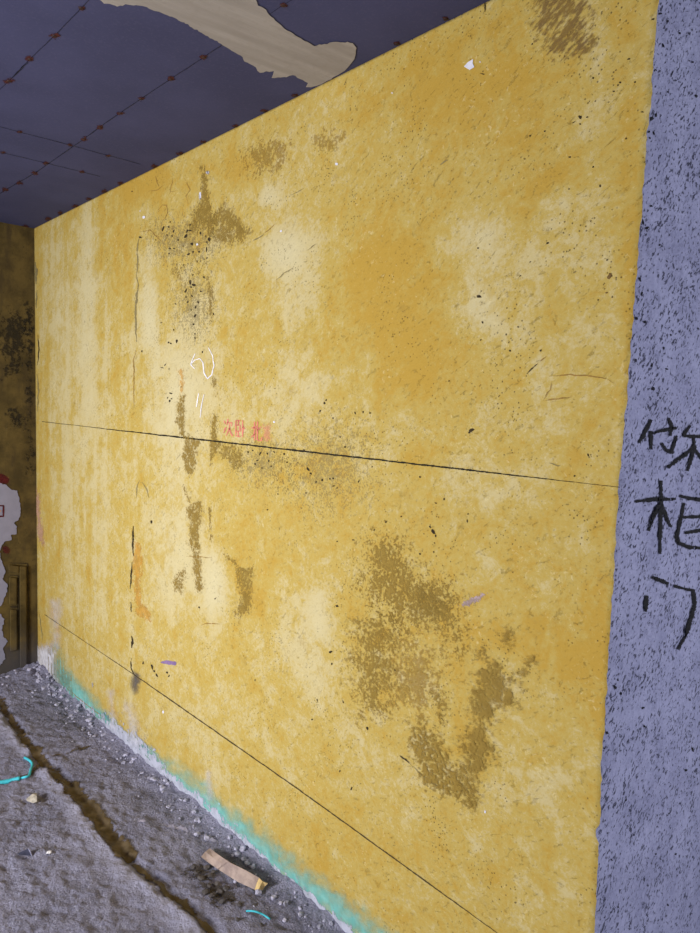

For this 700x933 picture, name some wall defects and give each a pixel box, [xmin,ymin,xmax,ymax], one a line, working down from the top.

water stain [530,0,597,58]
crack [133,176,190,400]
water stain [189,167,252,245]
peeling [0,483,21,665]
crack [128,526,136,609]
water stain [173,396,242,593]
water stain [223,554,253,615]
water stain [346,521,536,813]